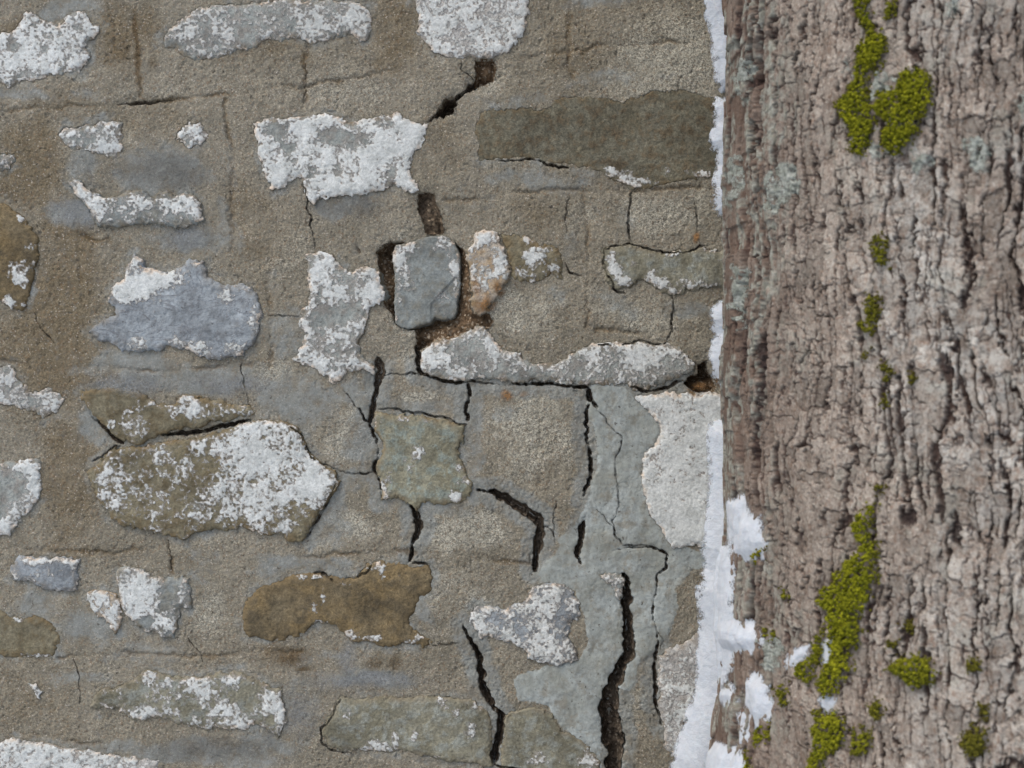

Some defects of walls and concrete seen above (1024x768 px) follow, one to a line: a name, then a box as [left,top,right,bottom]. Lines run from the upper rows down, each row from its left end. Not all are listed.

crack [430,65,478,122]
crack [161,365,249,436]
crack [92,419,124,461]
crack [286,345,669,768]